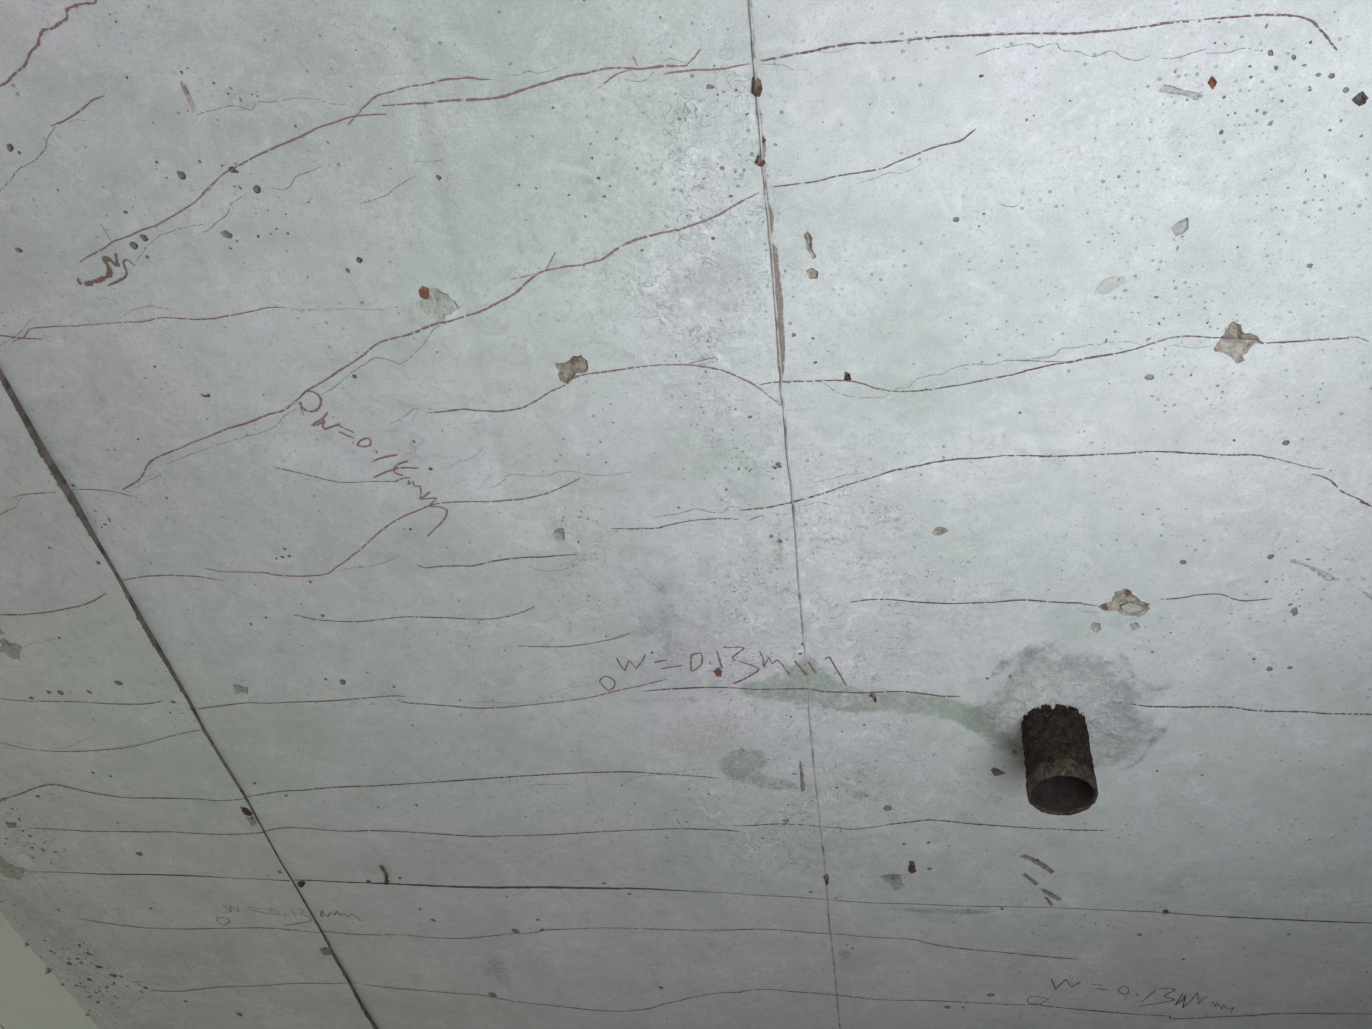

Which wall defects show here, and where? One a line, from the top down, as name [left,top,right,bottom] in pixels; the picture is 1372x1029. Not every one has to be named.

crack [0,0,97,87]
crack [80,14,1338,263]
crack [0,127,978,515]
spalling [556,355,588,384]
crack [390,335,1369,466]
spalling [1214,322,1260,364]
crack [618,451,1372,530]
crack [0,471,630,647]
crack [851,599,1106,613]
spalling [1090,589,1150,634]
crack [1161,594,1268,602]
spalling [0,856,26,880]